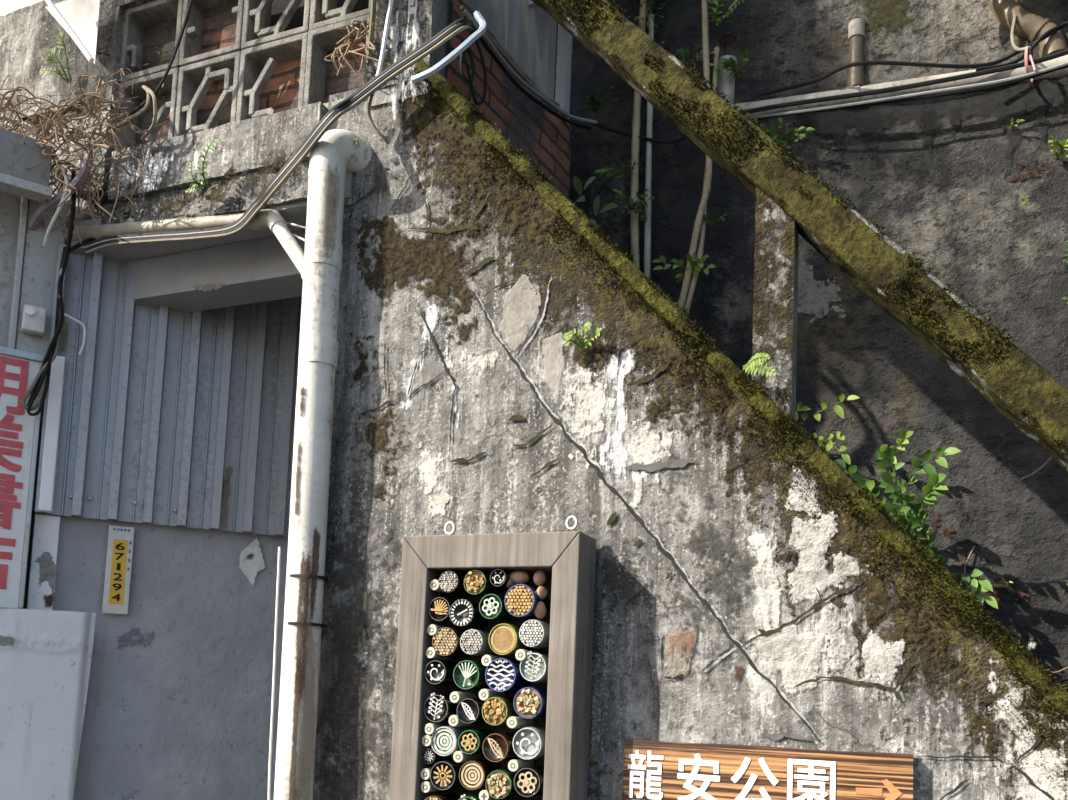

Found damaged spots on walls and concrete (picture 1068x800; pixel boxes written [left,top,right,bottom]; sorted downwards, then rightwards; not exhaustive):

damp [793,75,1068,171]
crack [344,177,493,234]
crack [357,297,485,463]
crack [464,256,921,743]
flaking render [785,467,873,605]
peeling [35,552,56,601]
rust [288,526,320,800]
spalling [662,626,697,679]
flaking render [748,623,826,696]
flaking render [861,630,905,684]
crack [915,731,1055,800]